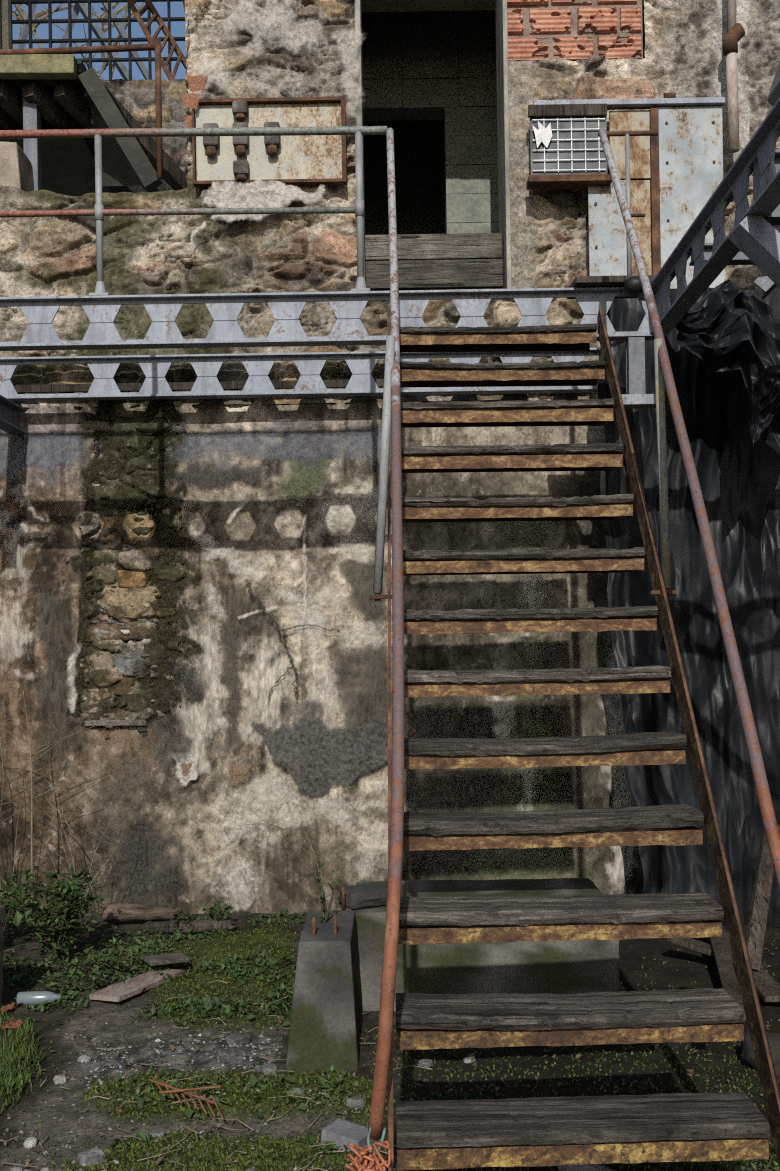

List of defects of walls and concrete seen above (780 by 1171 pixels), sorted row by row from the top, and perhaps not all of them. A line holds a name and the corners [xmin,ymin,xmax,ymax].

corrosion [609,110,652,275]
damp [0,434,79,472]
peeling [0,604,32,658]
damp [37,590,73,755]
spalling [65,391,185,738]